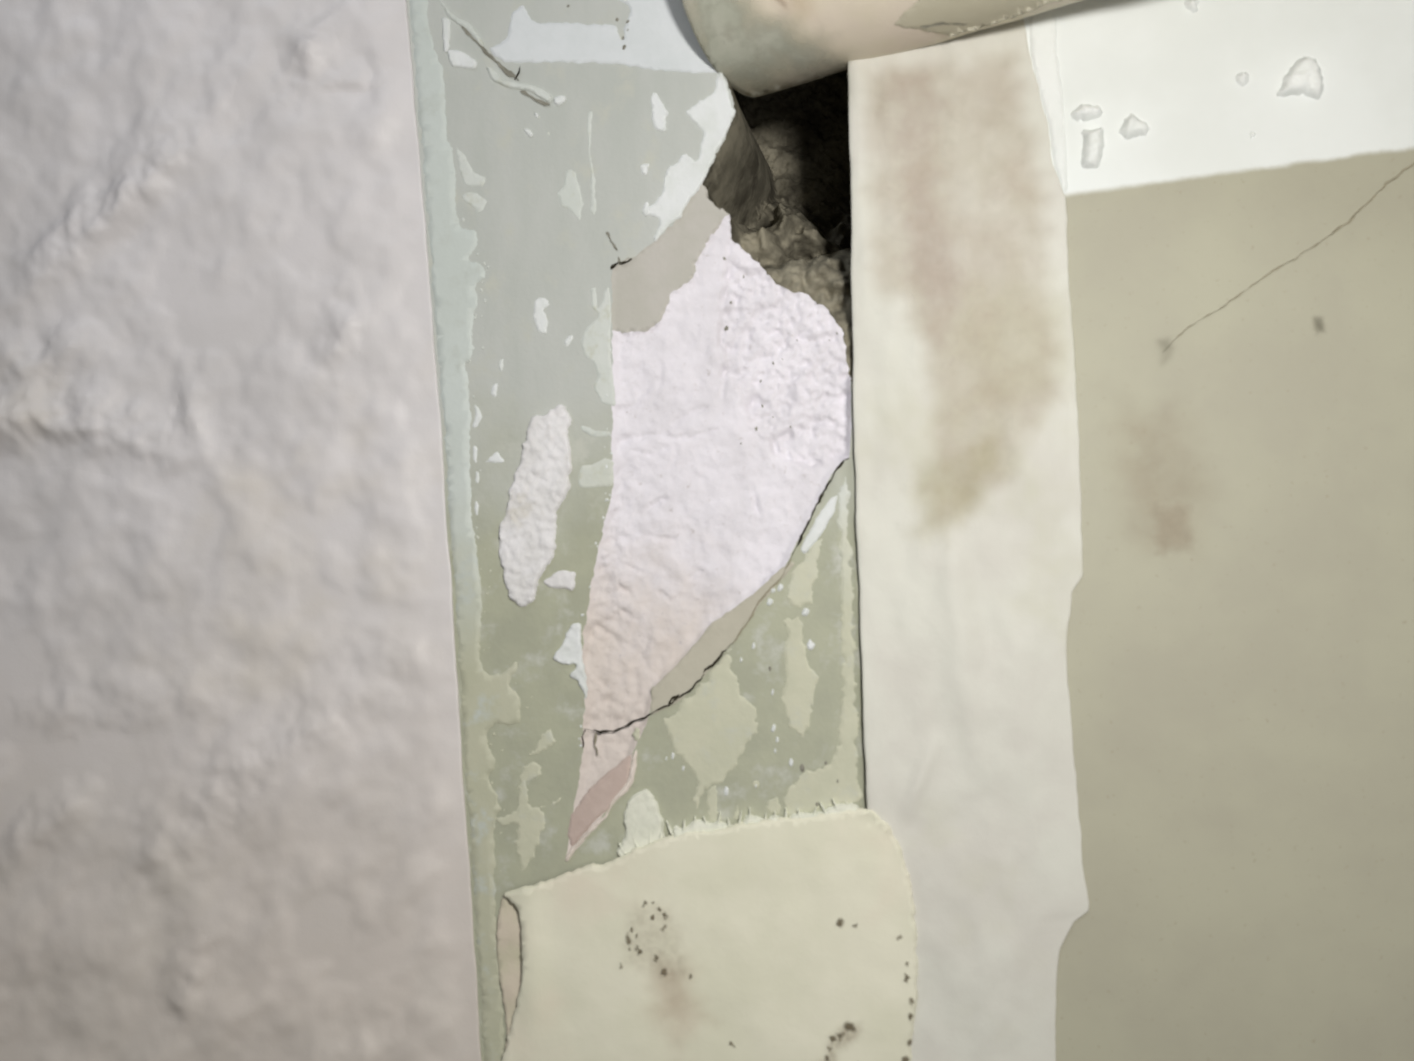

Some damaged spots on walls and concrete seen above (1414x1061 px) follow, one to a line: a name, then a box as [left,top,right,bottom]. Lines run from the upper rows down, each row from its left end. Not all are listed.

peeling [895,0,1062,37]
crack [1163,163,1414,352]
flaking render [409,0,863,1061]